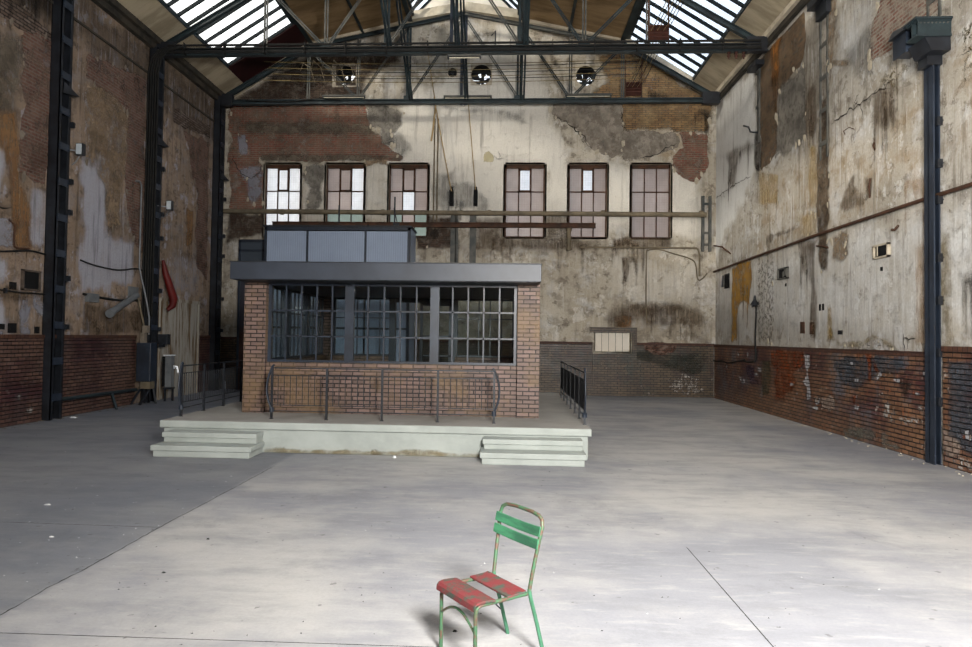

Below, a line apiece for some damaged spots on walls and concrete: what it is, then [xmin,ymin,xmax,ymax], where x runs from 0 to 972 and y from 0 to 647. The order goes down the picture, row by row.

flaking render [174,109,211,280]
flaking render [226,56,405,242]
flaking render [548,54,712,184]
flaking render [760,12,807,172]
flaking render [798,92,848,274]
flaking render [867,0,938,71]
crack [0,468,270,615]